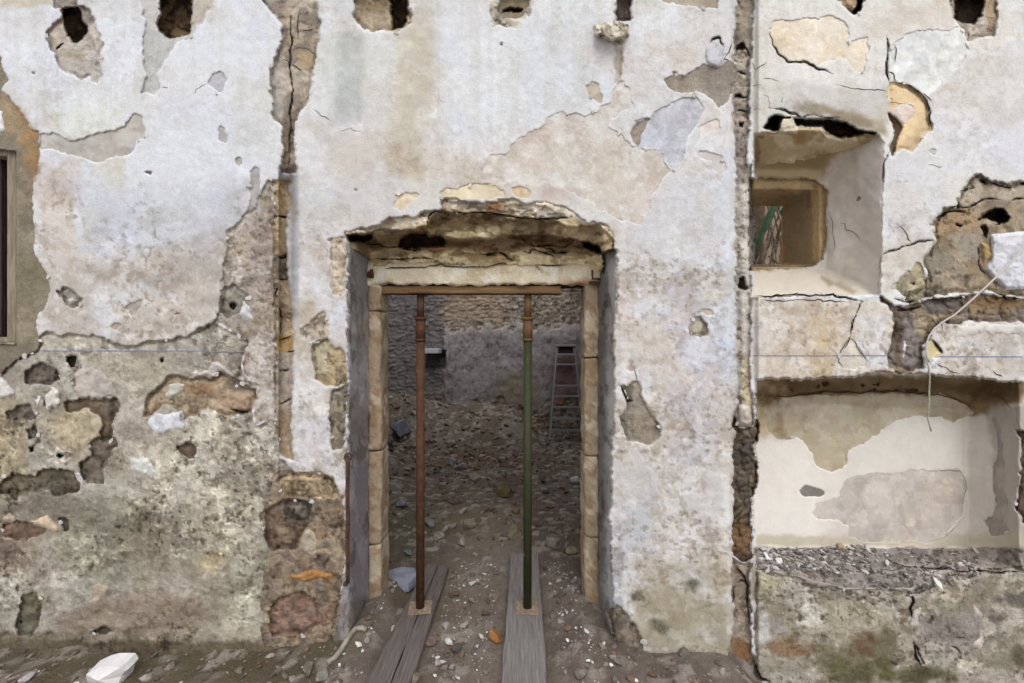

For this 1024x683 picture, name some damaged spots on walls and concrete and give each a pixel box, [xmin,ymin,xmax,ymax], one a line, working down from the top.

spalling [63,8,87,43]
crack [279,13,355,164]
flaking render [769,0,869,73]
flaking render [887,0,984,156]
spalling [0,56,348,657]
spalling [328,44,744,296]
spalling [617,361,661,445]
flaking render [765,381,974,544]
crack [755,155,1020,429]
spalling [891,174,1024,304]